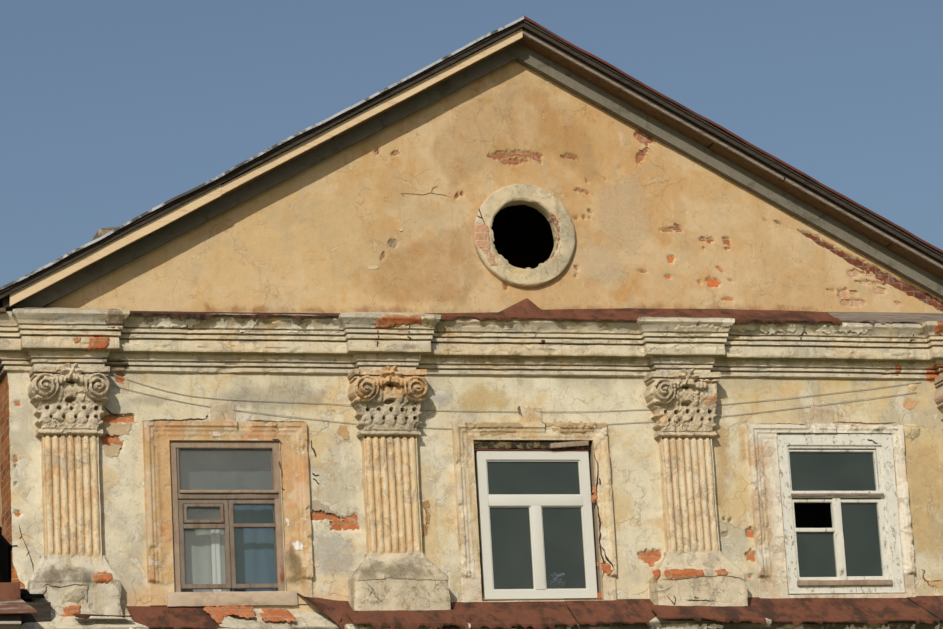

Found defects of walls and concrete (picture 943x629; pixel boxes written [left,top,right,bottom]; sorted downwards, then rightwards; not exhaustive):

flaking render [488,151,542,165]
flaking render [474,222,498,267]
flaking render [698,268,723,287]
flaking render [802,232,943,336]
peeling [148,317,258,332]
peeling [287,322,339,333]
spalling [375,315,422,330]
flaking render [673,319,796,339]
flaking render [101,415,135,457]
spalling [310,500,359,531]
spalling [637,550,728,580]
flaking render [203,605,296,623]